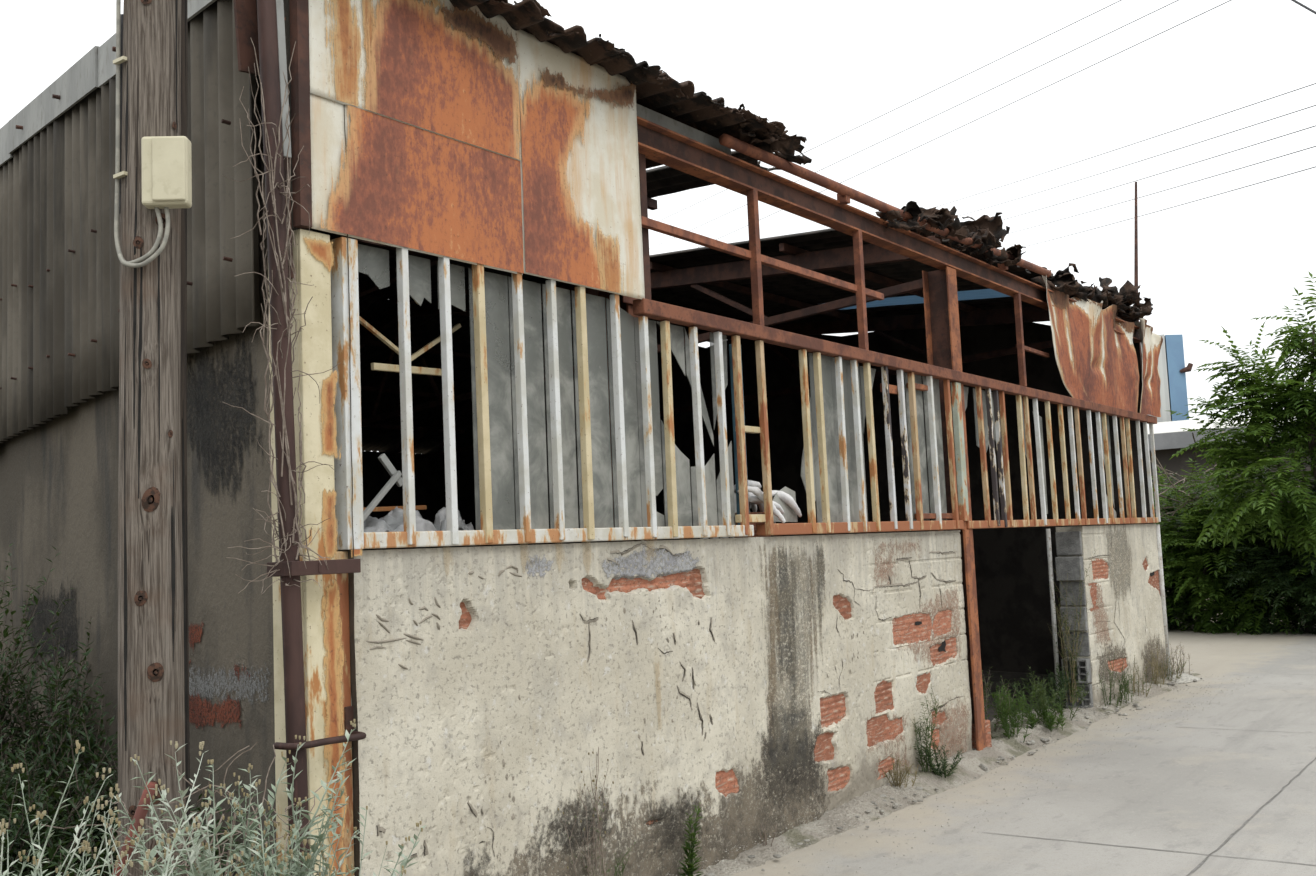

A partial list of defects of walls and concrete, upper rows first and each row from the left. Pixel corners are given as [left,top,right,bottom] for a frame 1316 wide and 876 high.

rust [303,0,637,294]
rust [1047,283,1163,417]
rust [321,371,341,458]
rust [322,489,362,559]
flaking render [582,544,705,628]
flaking render [833,595,864,673]
crack [818,551,956,694]
flaking render [892,589,962,694]
rust [322,579,347,876]
water stain [465,545,834,876]
flaking render [814,693,850,792]
flaking render [866,680,909,780]